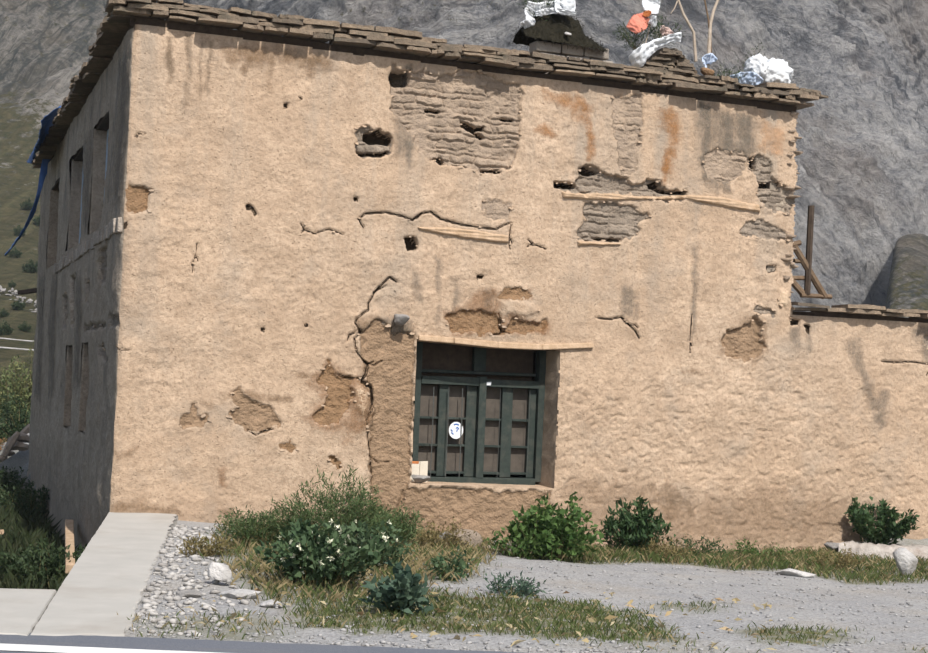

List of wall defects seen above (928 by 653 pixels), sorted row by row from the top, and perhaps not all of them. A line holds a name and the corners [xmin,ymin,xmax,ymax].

flaking render [354,125,392,158]
flaking render [388,64,524,175]
flaking render [556,94,687,241]
flaking render [701,147,795,215]
crack [301,211,545,249]
flaking render [740,219,791,242]
flaking render [445,309,548,337]
crack [607,317,640,339]
flaking render [721,302,776,363]
crack [337,277,396,473]
flaking render [226,387,281,433]
flaking render [357,319,552,541]